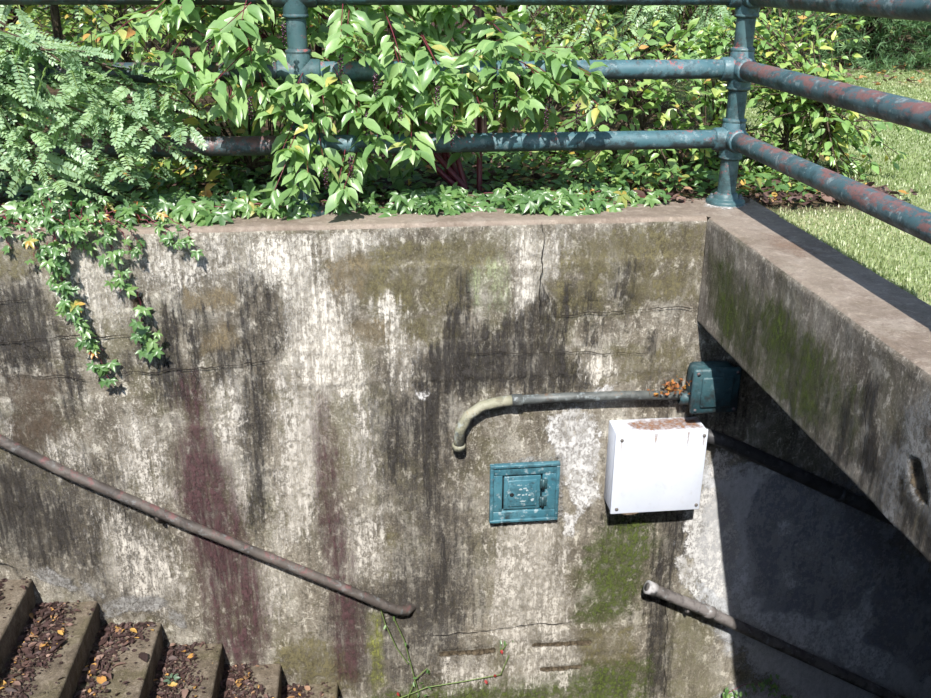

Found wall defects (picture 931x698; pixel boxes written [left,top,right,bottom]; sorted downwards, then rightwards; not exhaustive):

crack [0,335,130,380]
damp [80,501,191,612]
damp [117,413,177,504]
crack [118,360,270,391]
rust [176,379,268,666]
damp [144,228,534,553]
damp [344,507,388,581]
damp [487,520,578,691]
damp [545,224,703,386]
peeling [675,448,741,609]
damp [601,427,931,698]
spalling [910,459,930,503]